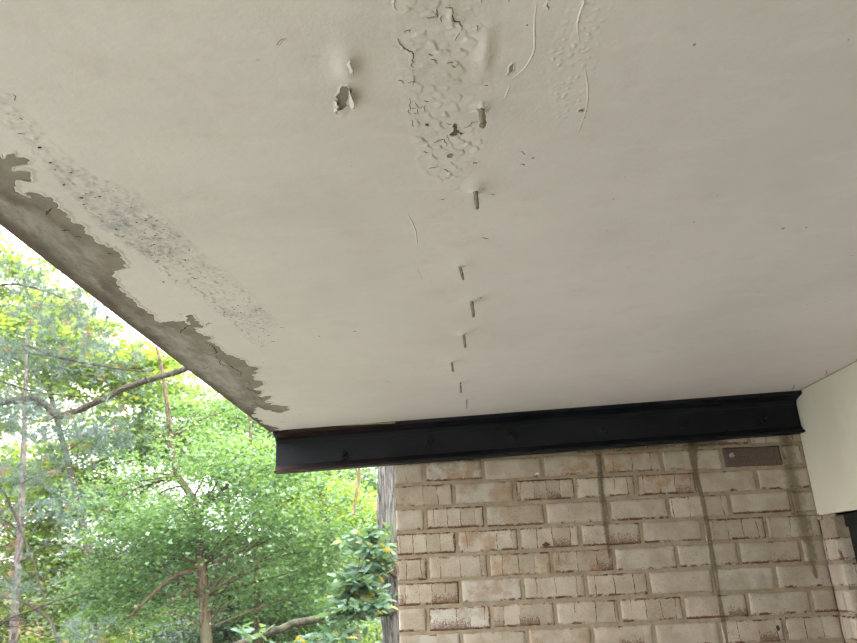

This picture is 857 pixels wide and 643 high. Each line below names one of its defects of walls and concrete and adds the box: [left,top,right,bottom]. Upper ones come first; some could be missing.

peeling [332,60,355,118]
crack [396,0,479,127]
crack [423,121,478,172]
peeling [0,149,292,432]
damp [578,441,728,643]